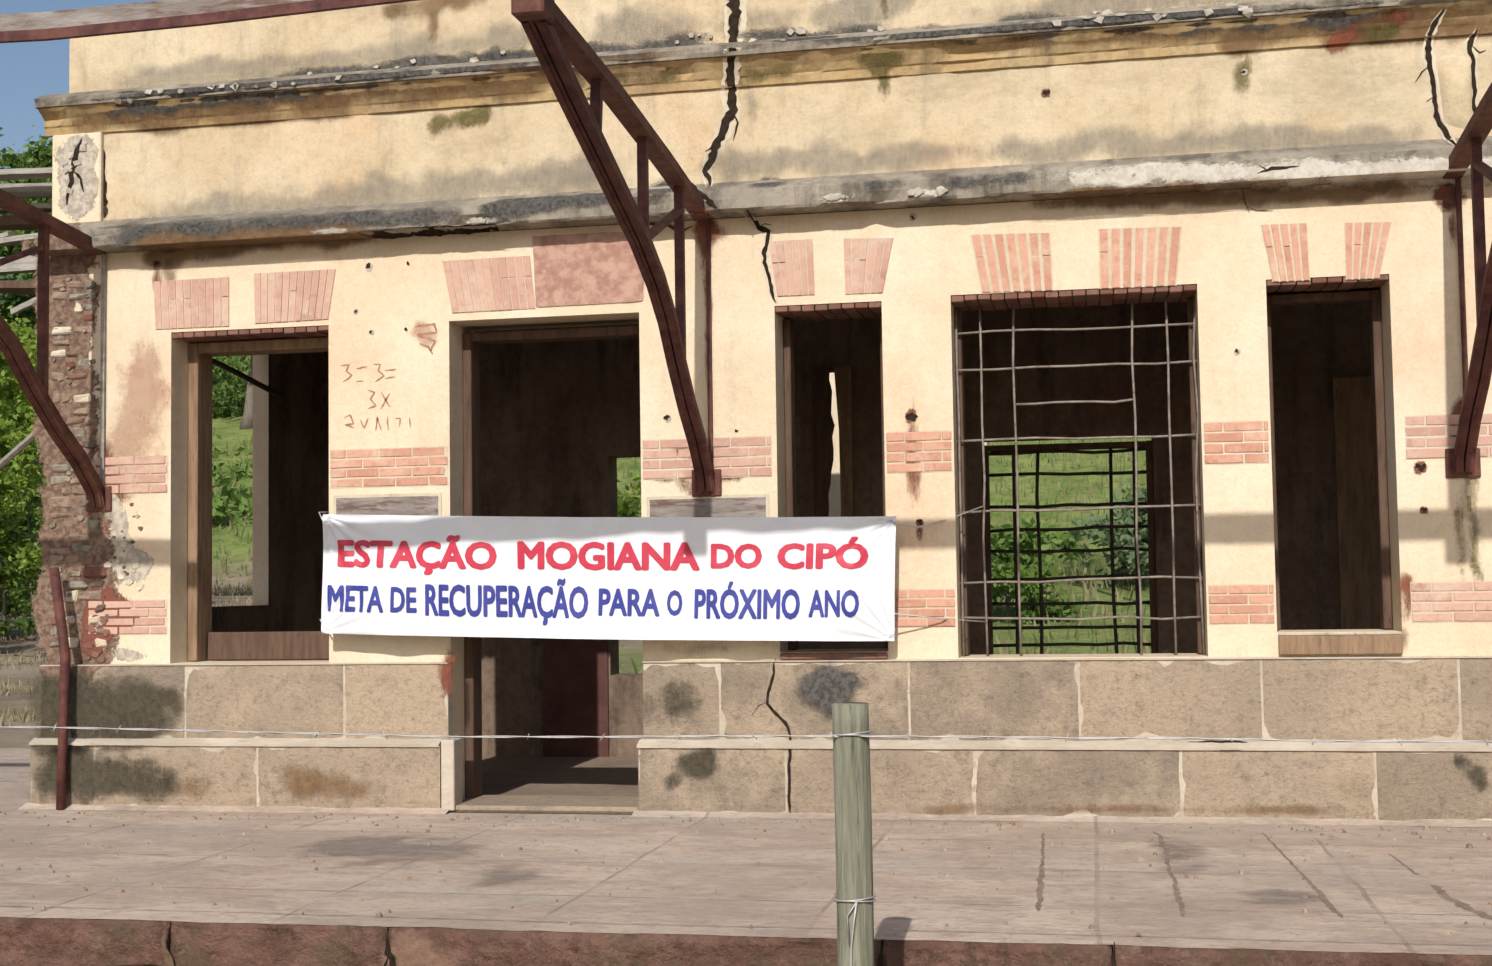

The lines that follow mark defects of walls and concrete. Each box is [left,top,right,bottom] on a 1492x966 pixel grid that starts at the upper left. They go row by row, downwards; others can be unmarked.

water stain [74,0,547,134]
water stain [588,14,703,81]
water stain [766,0,1492,91]
crack [1415,10,1486,147]
crack [649,0,778,303]
spalling [21,133,101,470]
spalling [31,414,154,683]
water stain [26,672,197,805]
water stain [666,748,715,788]
crack [752,658,792,813]
water stain [798,665,862,718]
crack [384,933,396,966]